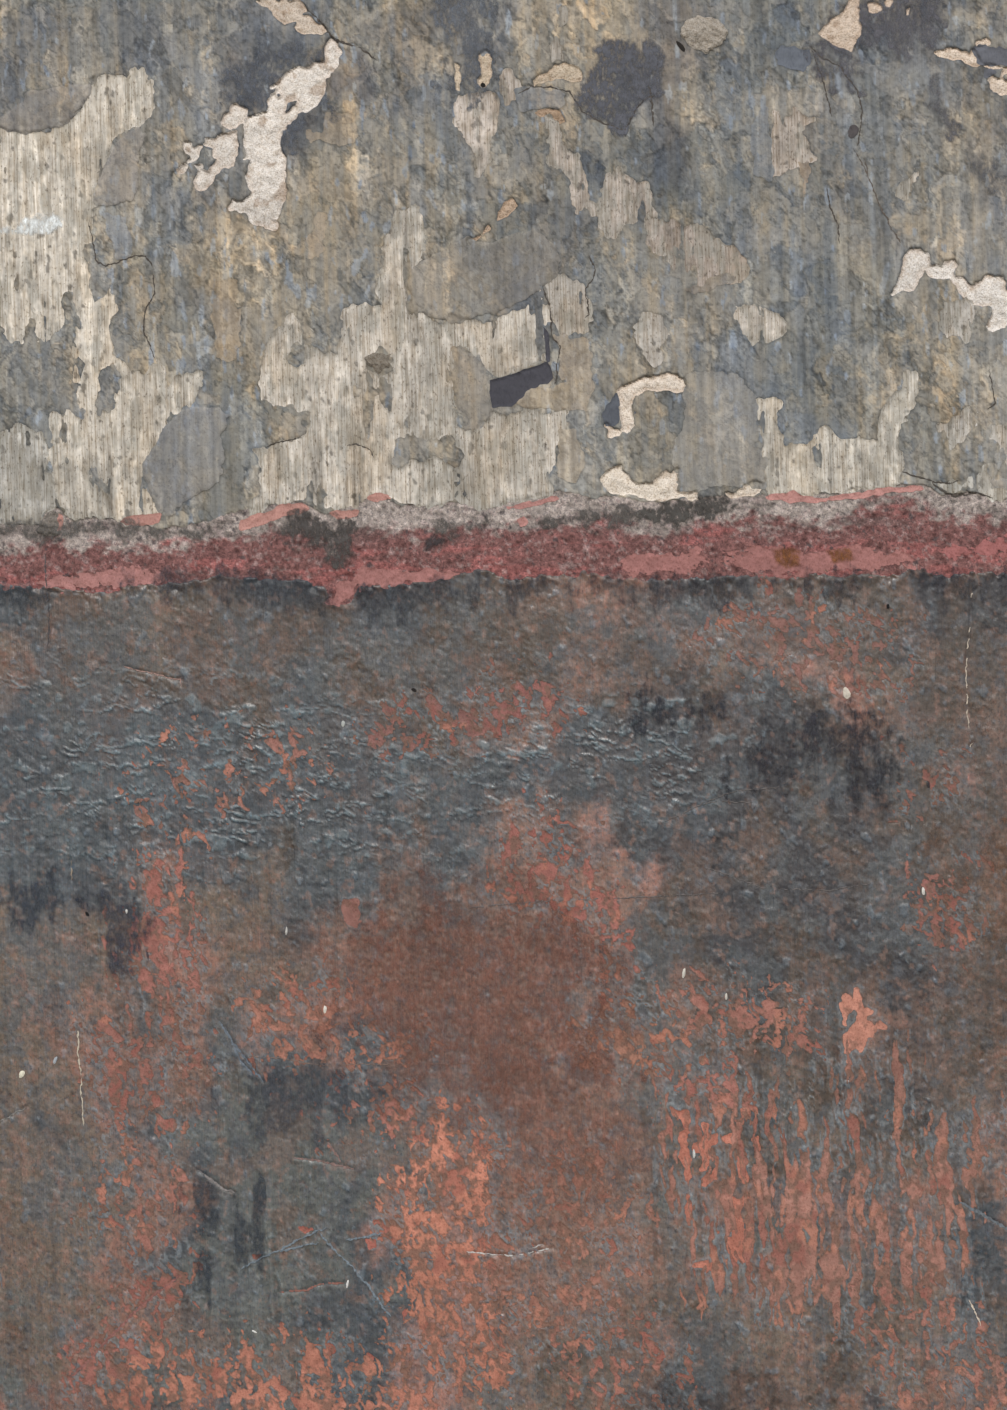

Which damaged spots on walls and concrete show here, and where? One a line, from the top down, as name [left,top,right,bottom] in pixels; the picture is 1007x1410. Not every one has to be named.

spalling [176,0,342,231]
peeling [452,5,583,178]
peeling [535,108,750,287]
peeling [771,106,817,177]
spalling [818,0,910,52]
peeling [0,67,230,531]
peeling [239,198,594,531]
spalling [602,312,686,438]
spalling [600,465,698,502]
peeling [733,304,787,346]
peeling [725,370,1007,504]
spalling [891,249,1007,344]